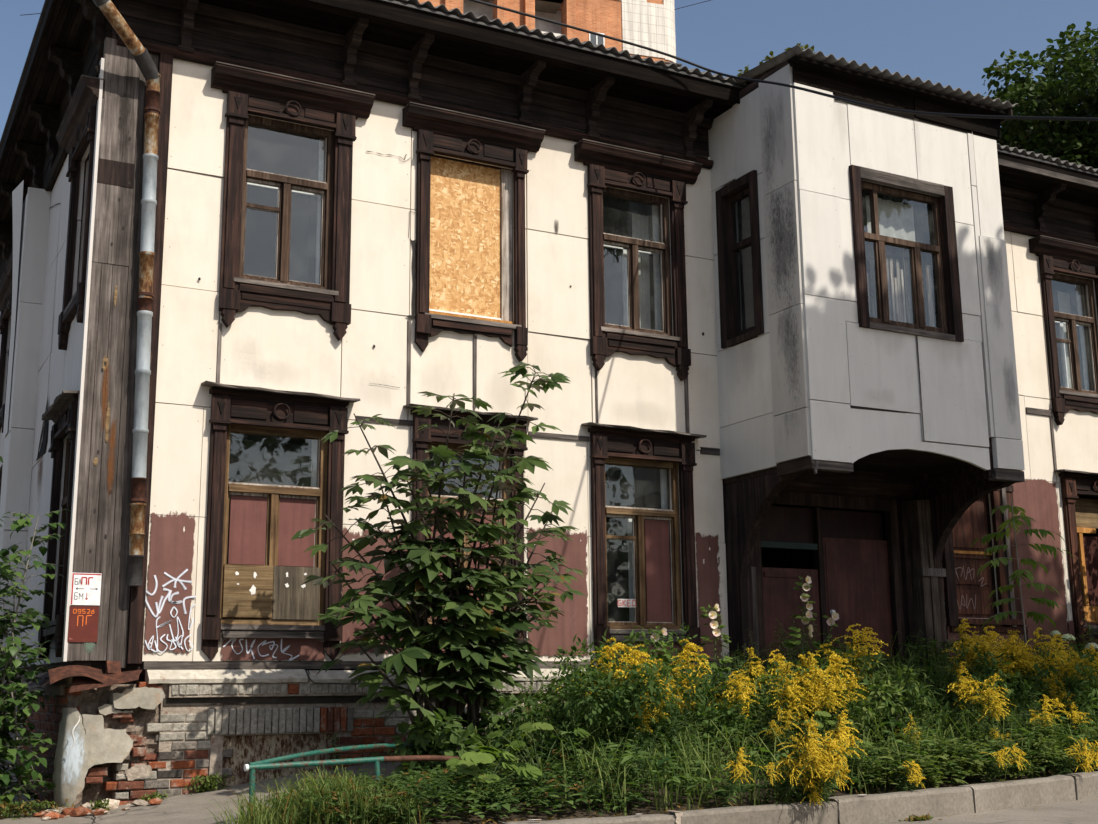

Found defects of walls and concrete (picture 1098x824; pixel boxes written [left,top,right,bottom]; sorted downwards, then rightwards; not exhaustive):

corrosion [119,96,130,155]
corrosion [102,367,115,486]
spalling [68,682,166,808]